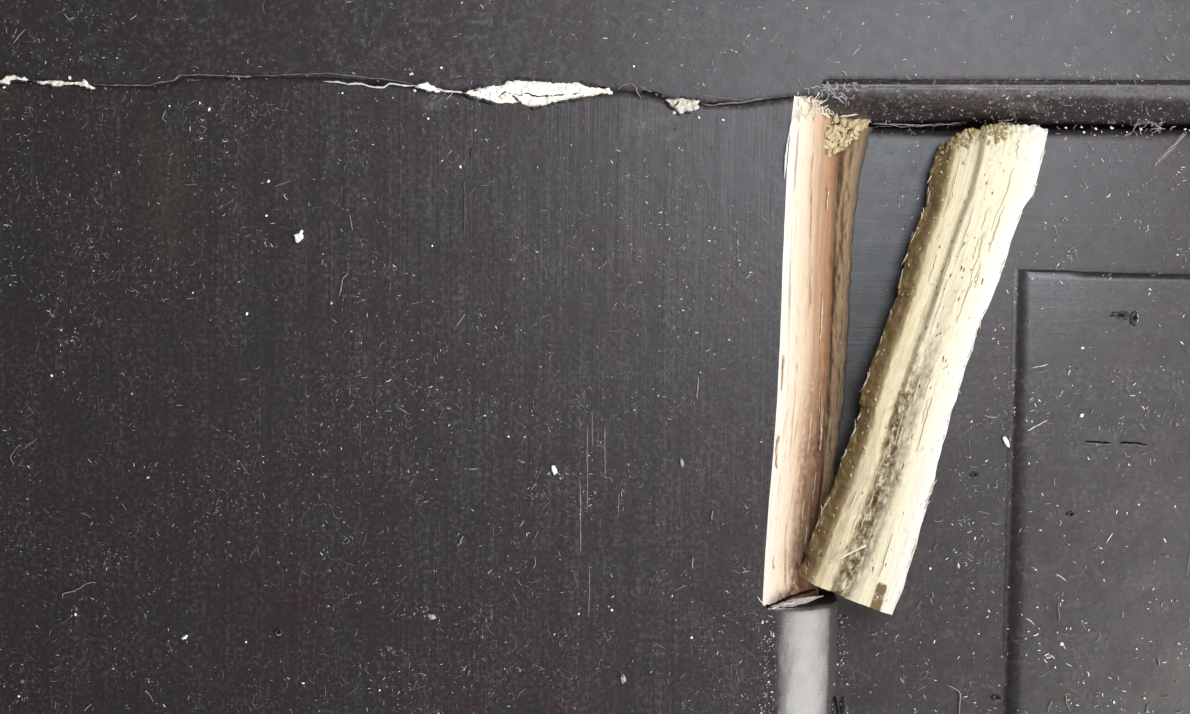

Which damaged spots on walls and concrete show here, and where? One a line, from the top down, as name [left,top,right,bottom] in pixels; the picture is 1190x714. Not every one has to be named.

crack [94,73,463,93]
spalling [462,77,613,110]
crack [597,83,663,98]
crack [702,95,770,106]